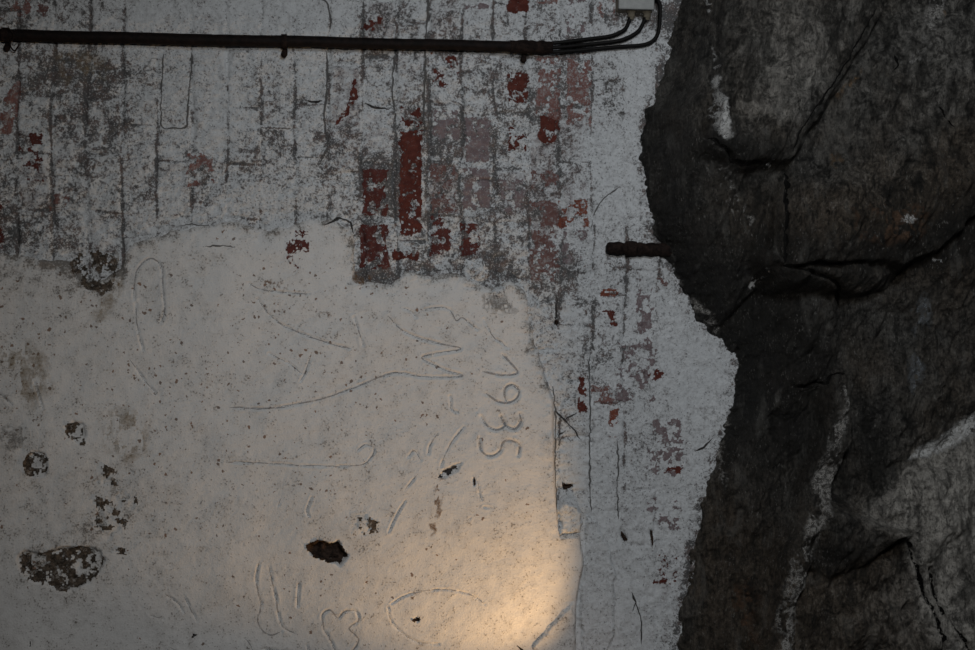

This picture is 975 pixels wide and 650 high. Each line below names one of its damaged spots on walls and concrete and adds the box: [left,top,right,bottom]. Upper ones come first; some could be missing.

peeling [432,56,459,88]
peeling [336,79,358,125]
peeling [506,52,592,151]
peeling [359,105,590,282]
flaking render [65,422,86,446]
flaking render [23,451,48,476]
flaking render [101,465,118,486]
flaking render [94,496,138,530]
flaking render [19,546,104,592]
flaking render [306,540,348,564]